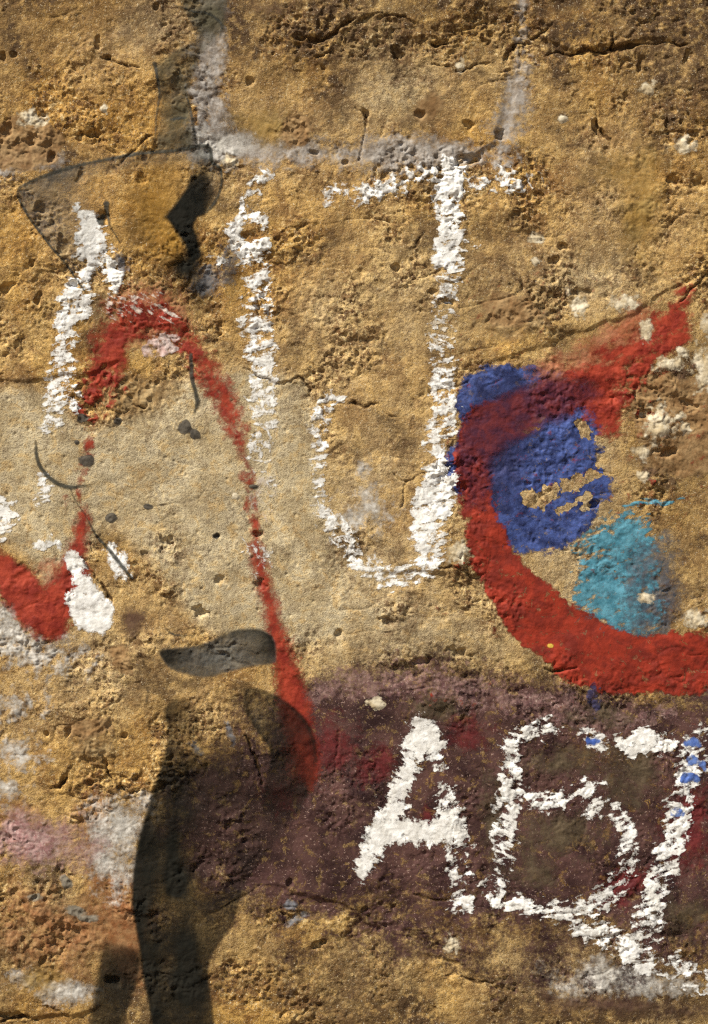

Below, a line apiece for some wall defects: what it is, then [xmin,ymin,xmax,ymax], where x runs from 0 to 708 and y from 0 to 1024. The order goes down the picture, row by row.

crack [296,14,411,43]
crack [509,33,640,57]